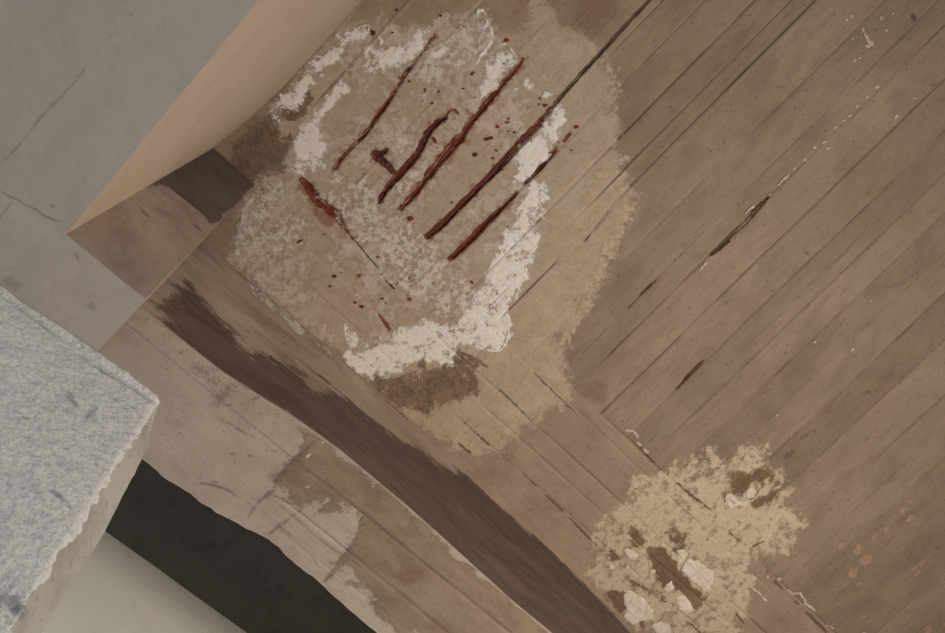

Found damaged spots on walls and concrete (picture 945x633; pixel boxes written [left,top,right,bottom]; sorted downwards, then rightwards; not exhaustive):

water stain [147,0,809,633]
peeling [725,466,781,510]
peeling [604,525,719,633]